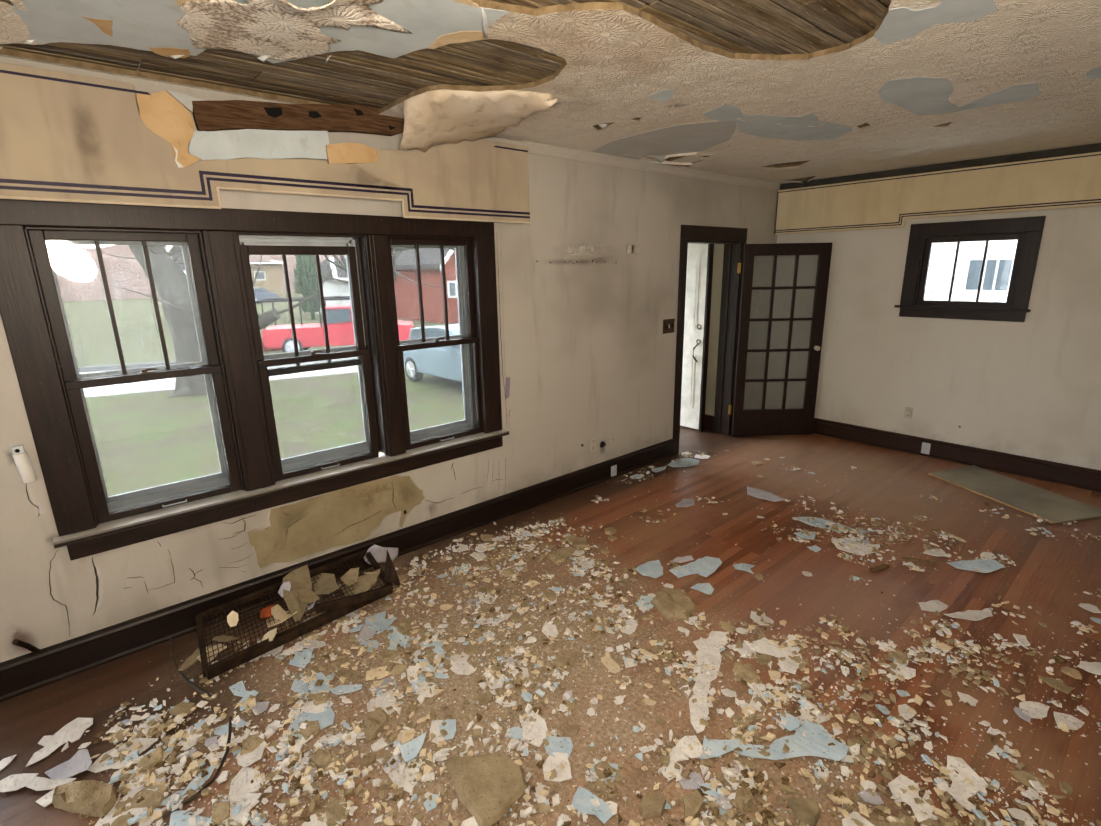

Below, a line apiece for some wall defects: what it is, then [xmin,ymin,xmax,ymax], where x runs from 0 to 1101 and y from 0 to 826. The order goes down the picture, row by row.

peeling [11,0,206,58]
peeling [254,0,509,63]
peeling [874,0,998,45]
peeling [136,90,378,168]
peeling [877,77,1039,115]
crack [49,547,99,636]
crack [129,515,256,593]
spalling [246,475,425,586]